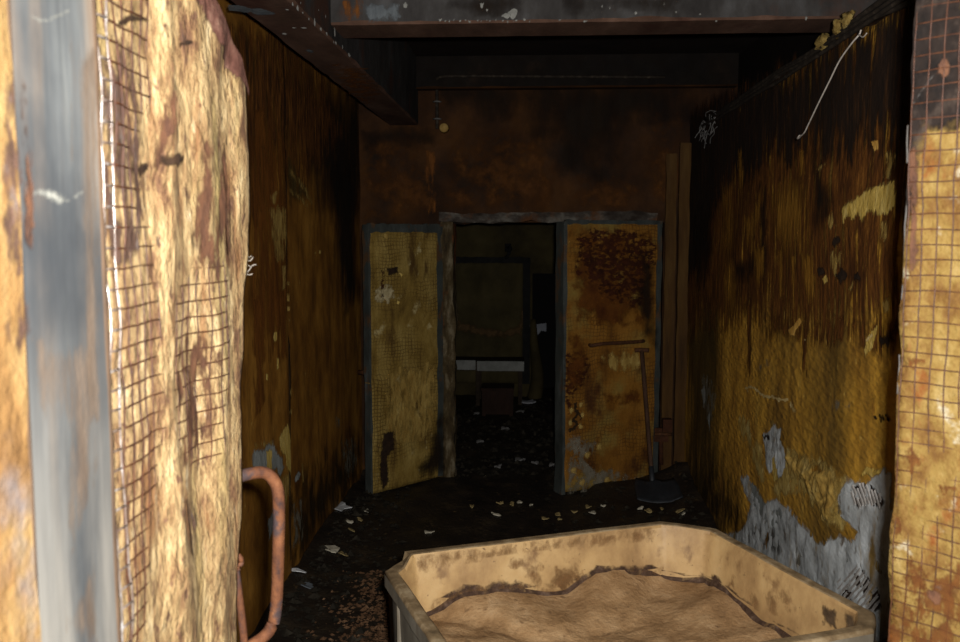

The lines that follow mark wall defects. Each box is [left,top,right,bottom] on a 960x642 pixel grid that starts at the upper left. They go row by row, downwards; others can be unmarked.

peeling [375,267,403,304]
rust [575,228,656,307]
peeling [772,140,896,340]
peeling [864,325,889,356]
damp [380,431,394,489]
flaking render [763,420,785,482]
flaking render [726,467,893,642]